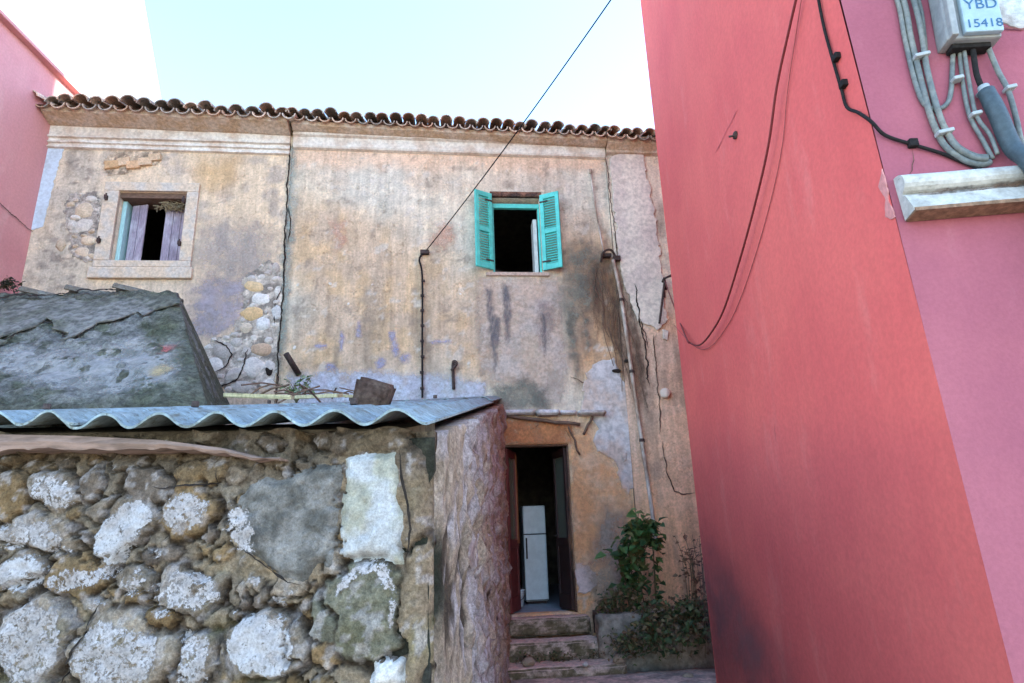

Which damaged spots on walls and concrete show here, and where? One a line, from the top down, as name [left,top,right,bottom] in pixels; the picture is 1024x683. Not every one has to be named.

flaking render [56,191,101,263]
crack [214,340,248,387]
flaking render [204,260,283,394]
crack [274,143,291,403]
leakage [487,286,511,359]
crack [635,285,692,495]
flaking render [491,357,633,565]